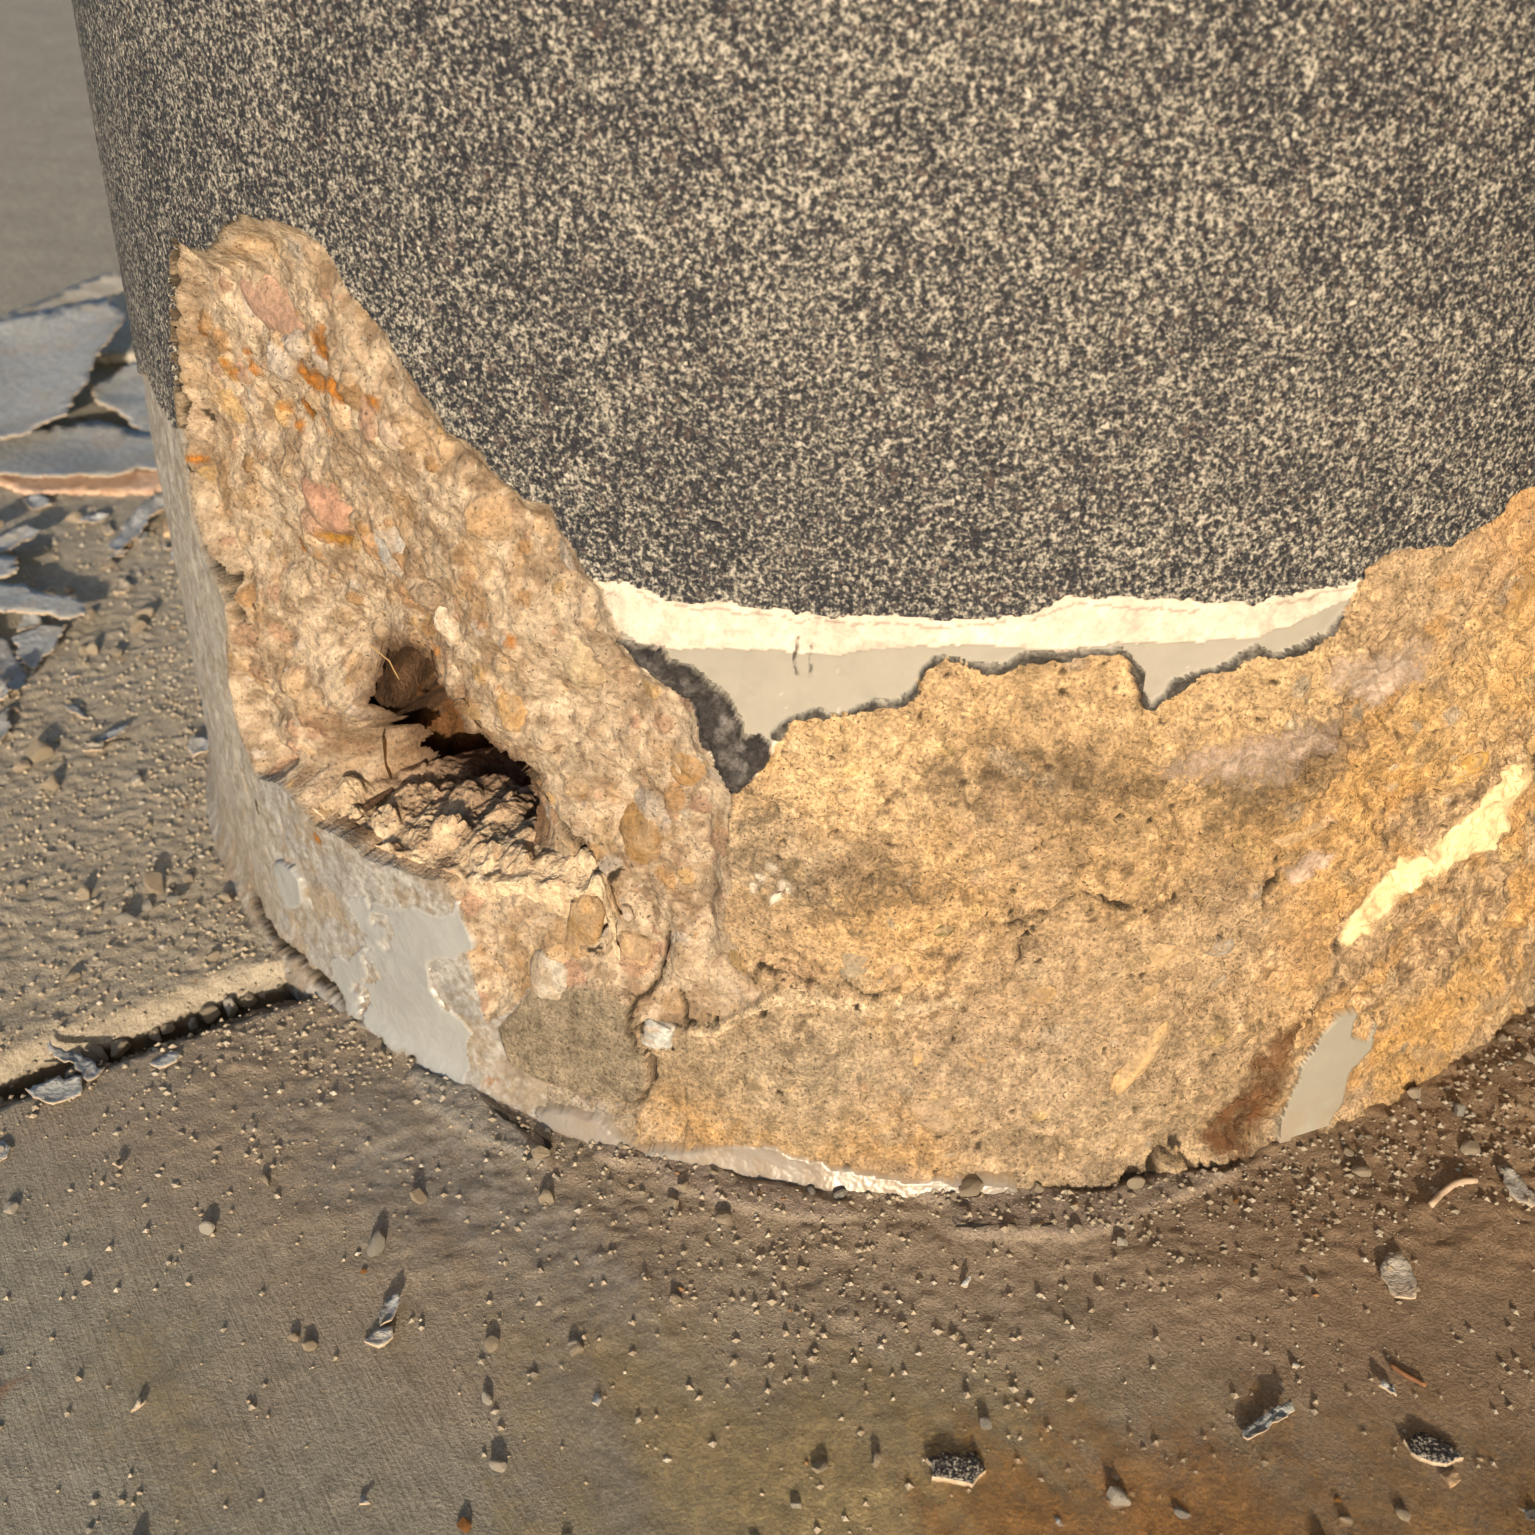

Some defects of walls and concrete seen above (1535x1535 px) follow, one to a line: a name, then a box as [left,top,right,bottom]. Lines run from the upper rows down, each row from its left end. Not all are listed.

peeling [169,213,1535,1198]
peeling [149,1051,181,1069]
crack [627,933,720,1127]
peeling [1498,1164,1535,1208]
rust [1092,1468,1290,1535]